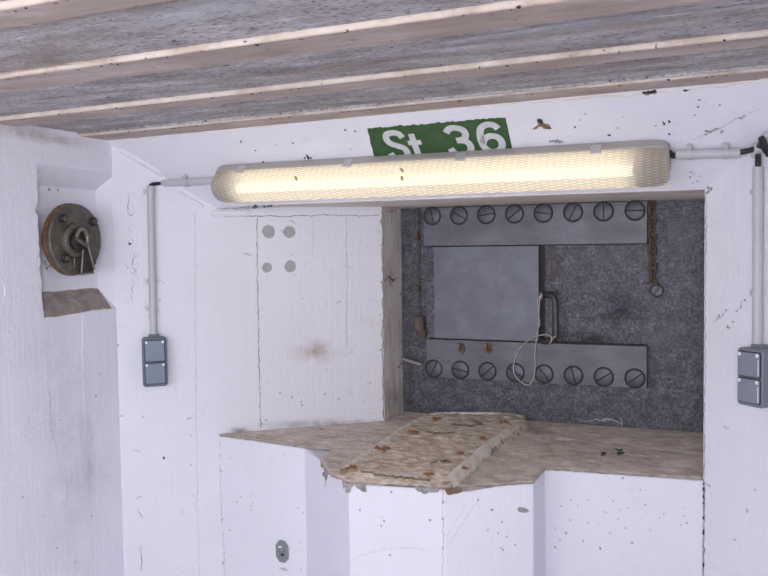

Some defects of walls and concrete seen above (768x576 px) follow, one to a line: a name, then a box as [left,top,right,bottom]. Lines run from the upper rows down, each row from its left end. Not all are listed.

spalling [321,464,527,501]